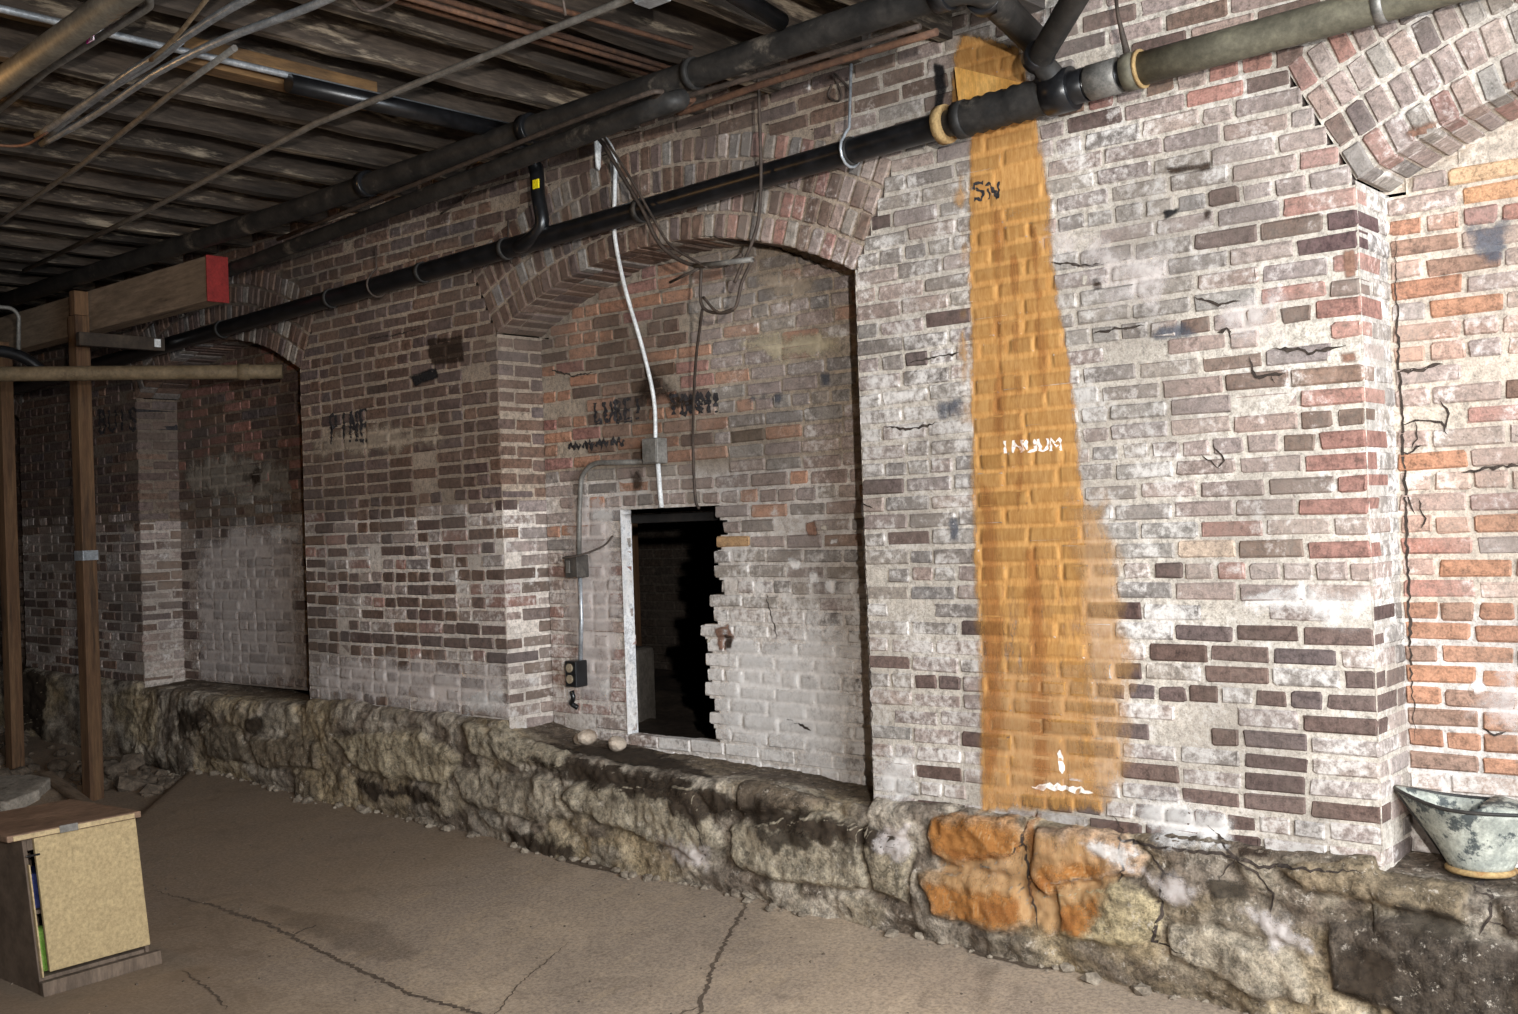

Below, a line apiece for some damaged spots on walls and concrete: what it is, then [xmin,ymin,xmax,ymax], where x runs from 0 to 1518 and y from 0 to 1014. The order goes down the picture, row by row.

crack [1394,241,1450,736]
spalling [707,625,734,650]
crack [1009,808,1038,928]
crack [1113,816,1365,954]
crack [150,890,567,1014]
crack [680,904,748,1014]